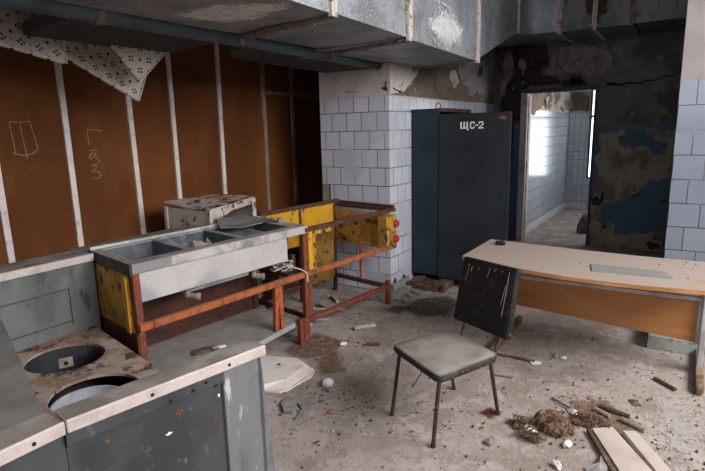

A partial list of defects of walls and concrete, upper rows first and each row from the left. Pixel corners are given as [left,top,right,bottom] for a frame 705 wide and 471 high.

peeling [544,42,614,78]
crack [597,71,682,88]
peeling [589,128,676,252]